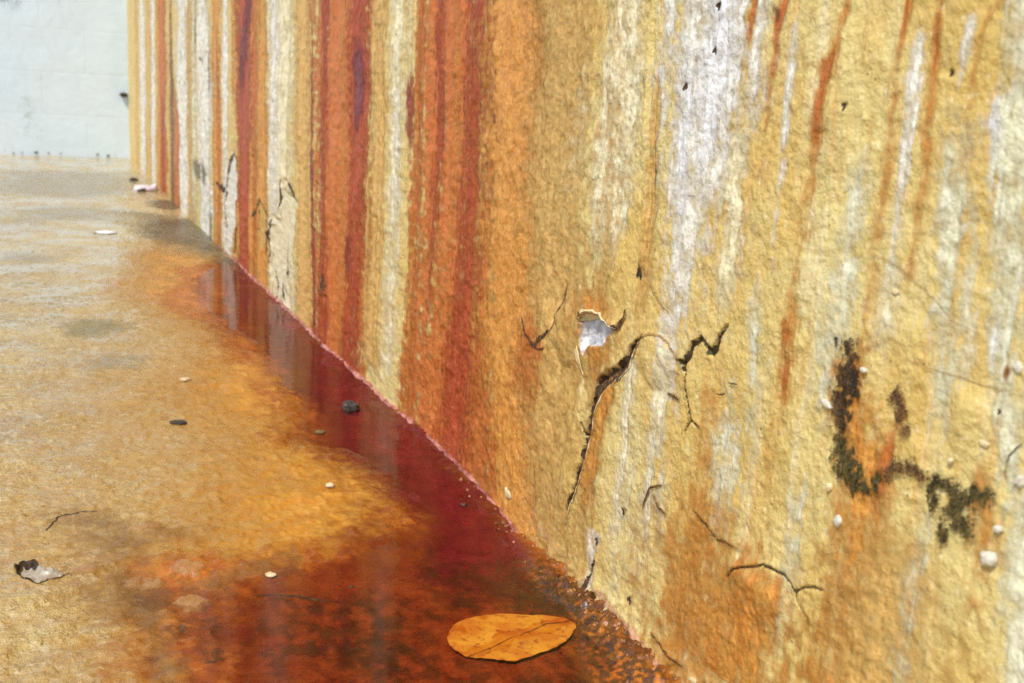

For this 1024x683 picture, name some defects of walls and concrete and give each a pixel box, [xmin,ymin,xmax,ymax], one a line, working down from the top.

rust [811,0,850,160]
rust [896,0,913,57]
rust [923,0,943,165]
rust [99,0,798,683]
crack [521,285,568,350]
spalling [573,309,614,377]
crack [565,259,729,525]
crack [695,512,821,617]